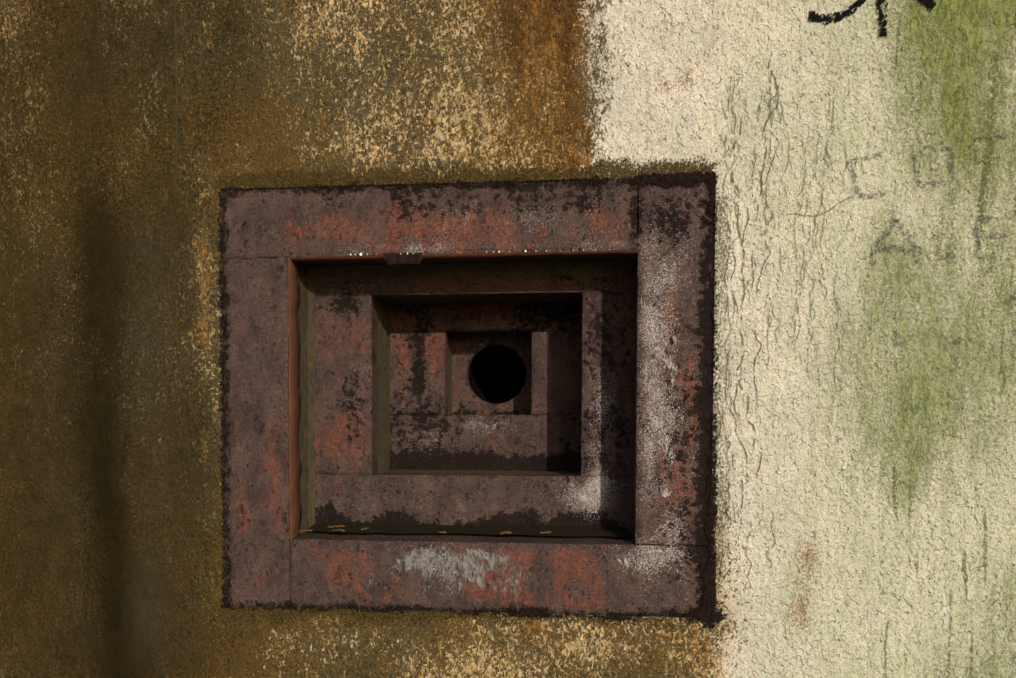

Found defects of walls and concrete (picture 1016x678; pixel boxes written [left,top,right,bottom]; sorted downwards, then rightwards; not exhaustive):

damp [0,0,219,678]
rust [288,255,386,539]
rust [422,250,638,262]
crack [715,54,853,599]